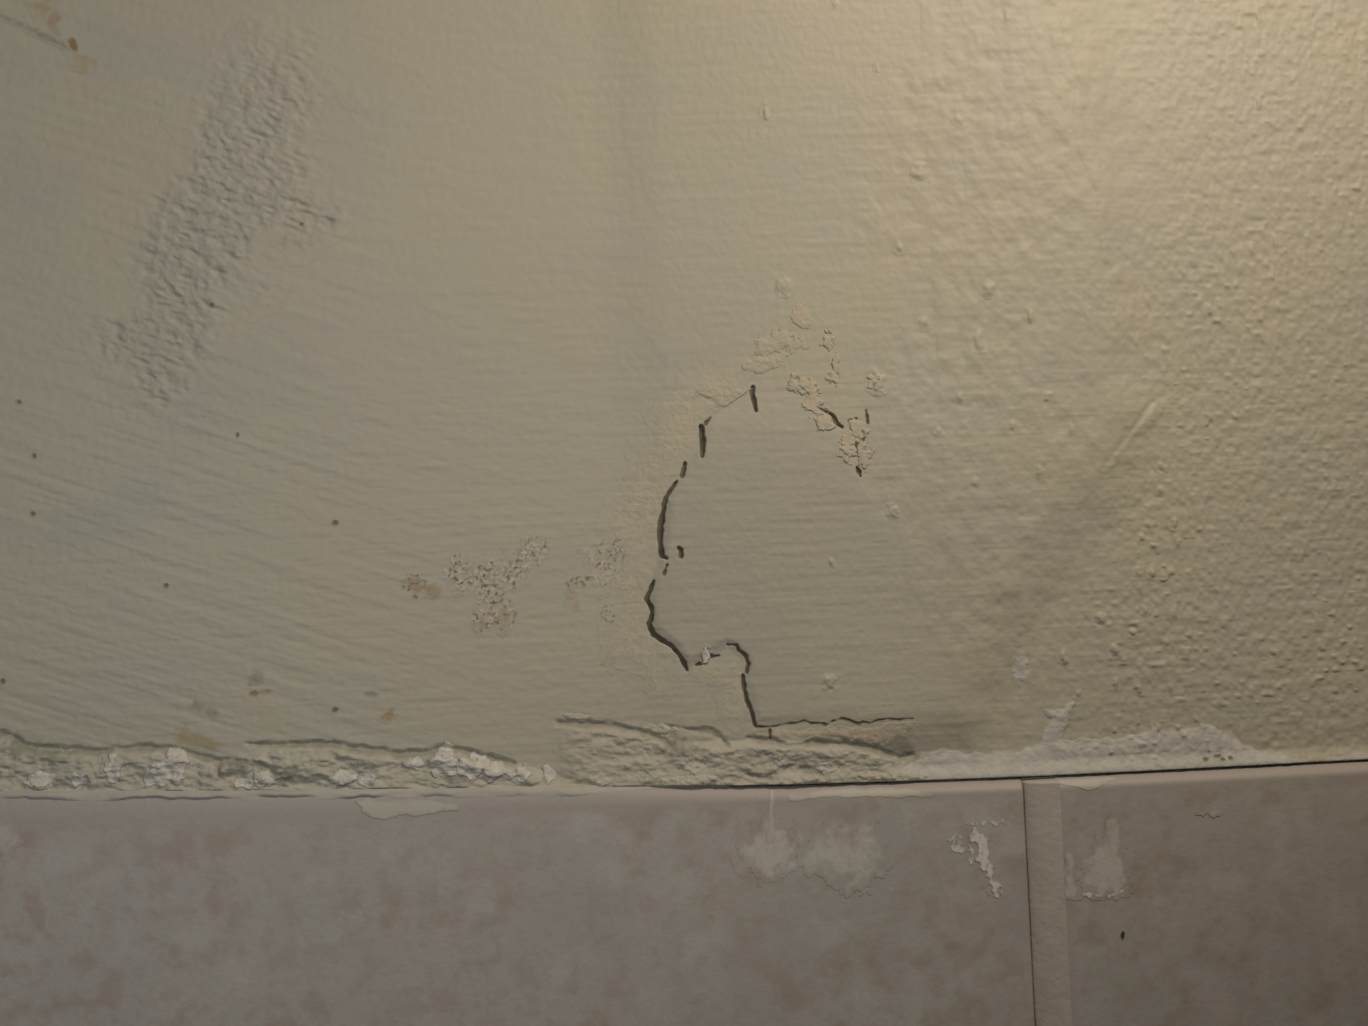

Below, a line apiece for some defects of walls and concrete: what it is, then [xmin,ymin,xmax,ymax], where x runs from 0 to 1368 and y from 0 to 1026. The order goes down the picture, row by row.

peeling [0,303,929,791]
crack [750,385,758,413]
crack [644,408,914,740]